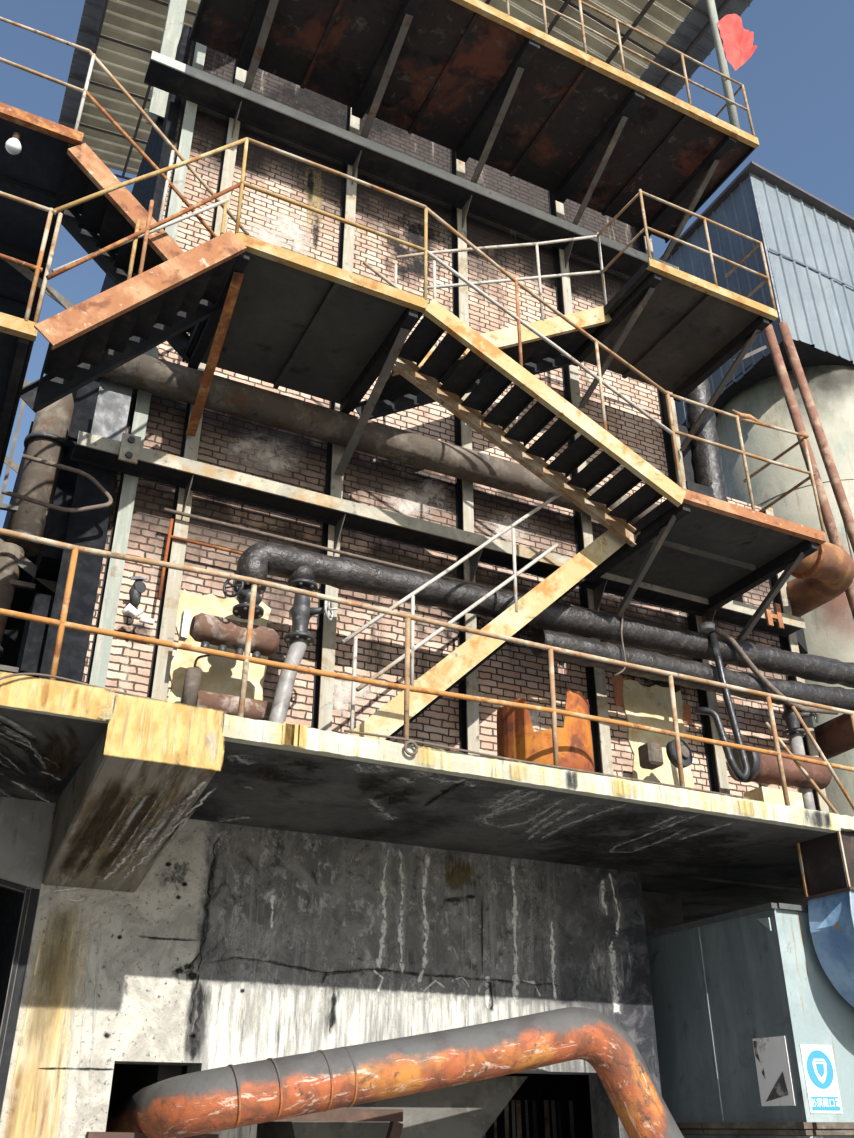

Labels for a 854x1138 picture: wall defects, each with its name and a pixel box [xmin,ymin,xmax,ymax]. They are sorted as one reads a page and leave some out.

crack [140,841,558,1023]